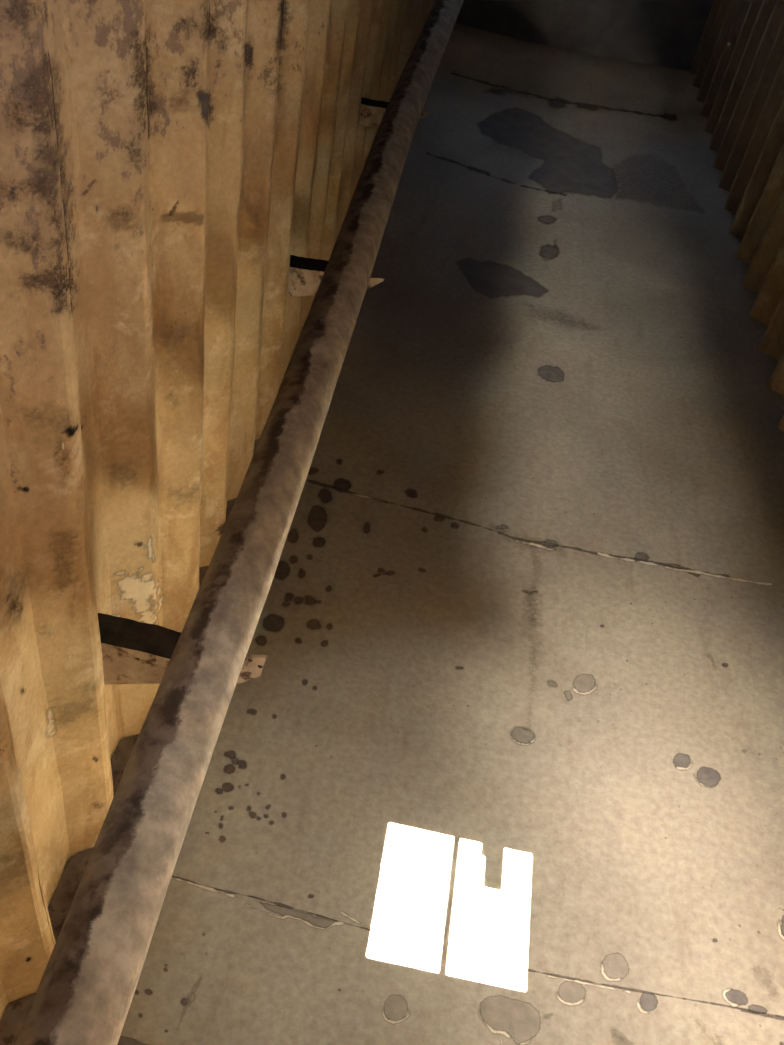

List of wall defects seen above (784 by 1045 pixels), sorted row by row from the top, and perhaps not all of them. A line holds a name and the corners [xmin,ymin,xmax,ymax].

water stain [477,108,704,213]
water stain [458,258,548,298]
crack [307,480,773,586]
peeling [115,538,163,624]
crack [172,875,374,932]
crack [528,969,784,1020]
peeling [117,1036,147,1045]